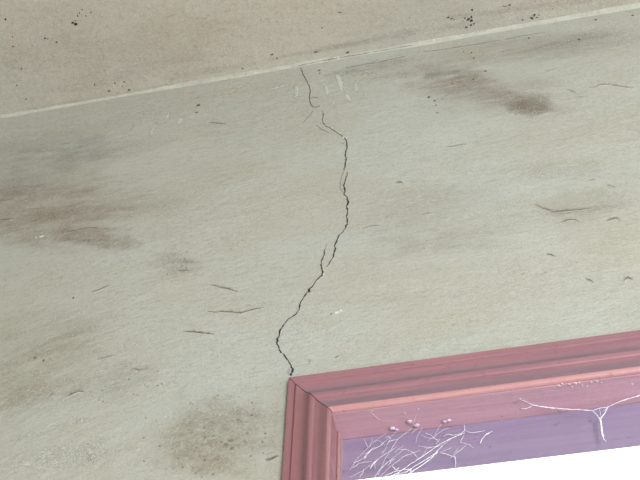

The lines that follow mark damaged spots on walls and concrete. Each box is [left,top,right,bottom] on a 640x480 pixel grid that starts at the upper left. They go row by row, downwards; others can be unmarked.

crack [276,32,545,376]